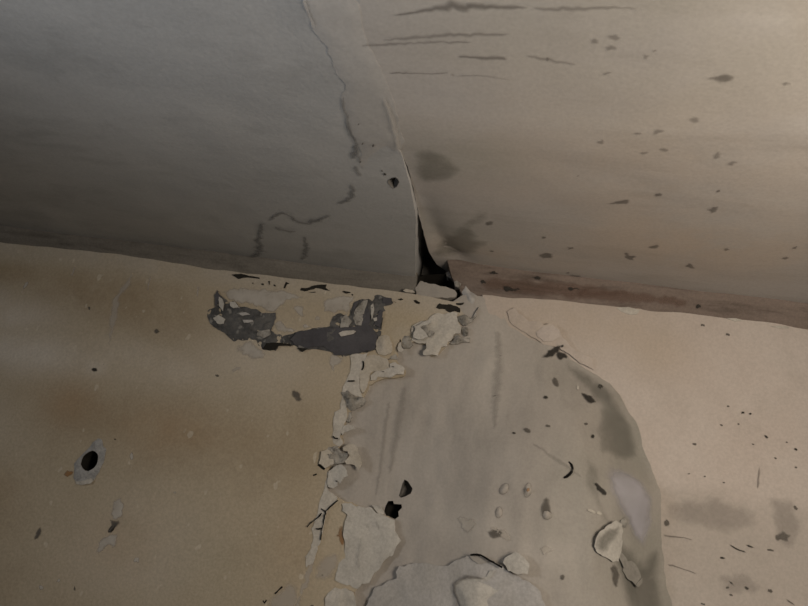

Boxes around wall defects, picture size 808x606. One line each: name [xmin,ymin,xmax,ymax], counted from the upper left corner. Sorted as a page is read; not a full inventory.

flaking render [207,290,545,606]